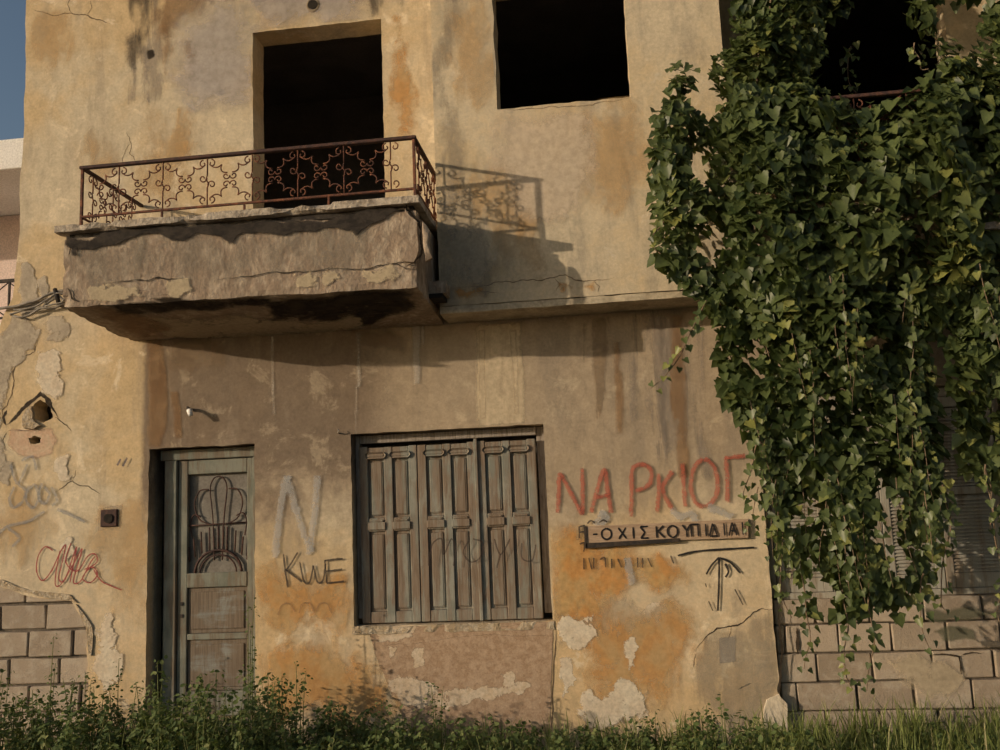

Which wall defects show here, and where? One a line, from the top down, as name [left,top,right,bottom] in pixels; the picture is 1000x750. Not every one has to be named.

crack [35,0,107,23]
water stain [128,35,140,63]
water stain [390,48,413,131]
spalling [362,209,419,283]
peeling [87,282,142,302]
peeling [166,278,192,298]
peeling [293,271,340,288]
crack [459,274,607,293]
peeling [8,349,71,481]
flaking render [0,580,123,750]
peeling [385,648,531,710]
peeling [557,615,649,730]